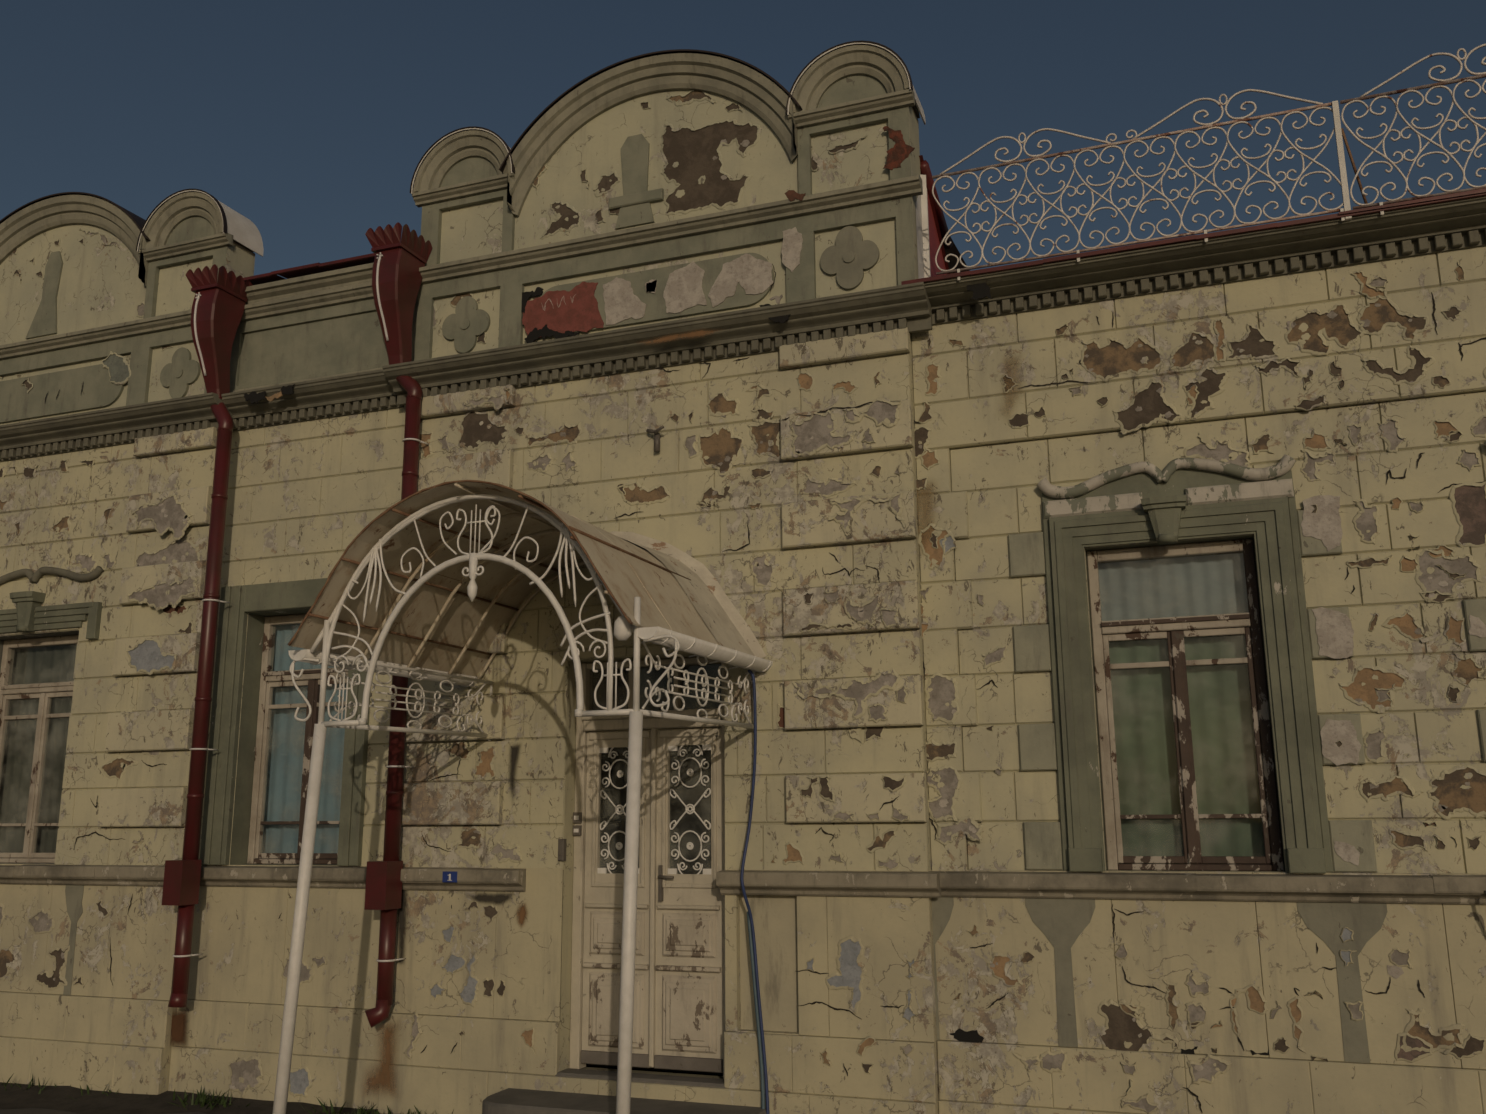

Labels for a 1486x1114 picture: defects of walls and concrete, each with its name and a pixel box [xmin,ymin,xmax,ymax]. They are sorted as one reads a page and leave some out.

spalling [641,90,762,216]
flaking render [521,227,803,343]
spalling [1001,271,1462,467]
peeling [671,337,964,639]
peeling [979,646,1007,689]
spalling [1300,415,1486,851]
spalling [1097,943,1329,1114]
spalling [1344,948,1486,1063]